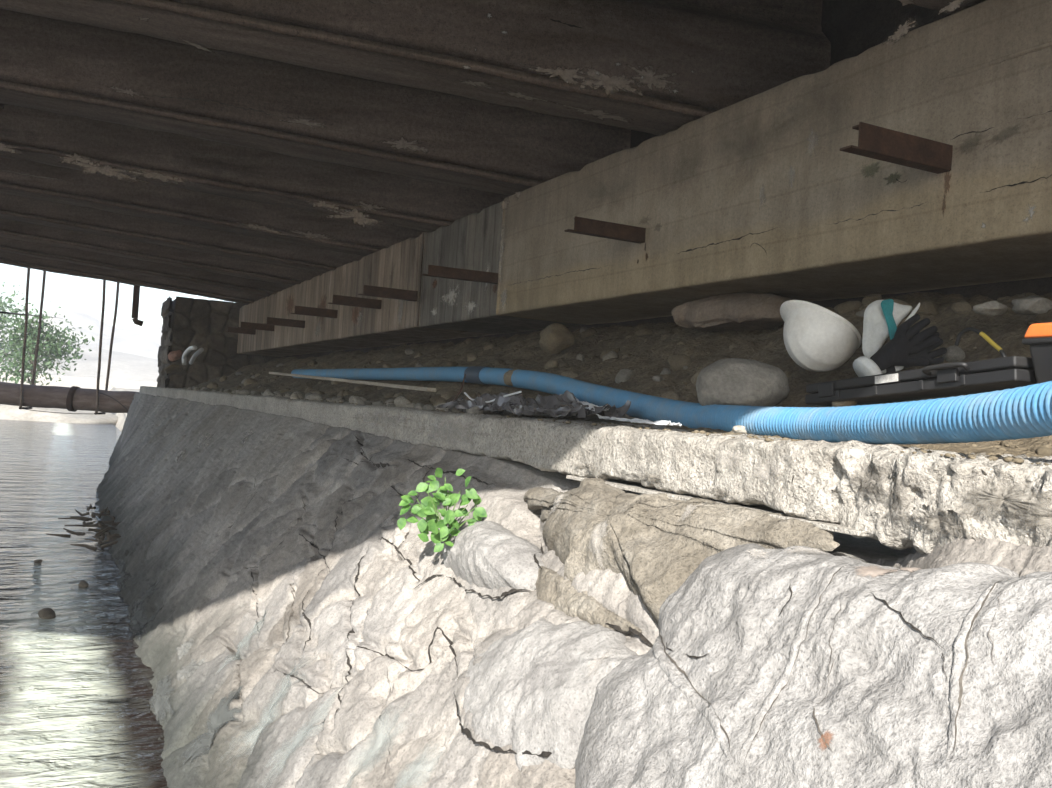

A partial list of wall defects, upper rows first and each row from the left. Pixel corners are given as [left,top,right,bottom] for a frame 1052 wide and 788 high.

spalling [938,0,964,15]
spalling [882,21,921,44]
spalling [520,63,679,96]
spalling [59,153,190,184]
crack [979,175,1051,193]
crack [678,227,780,254]
crack [228,436,552,779]
crack [605,563,854,759]
crack [873,580,1002,751]